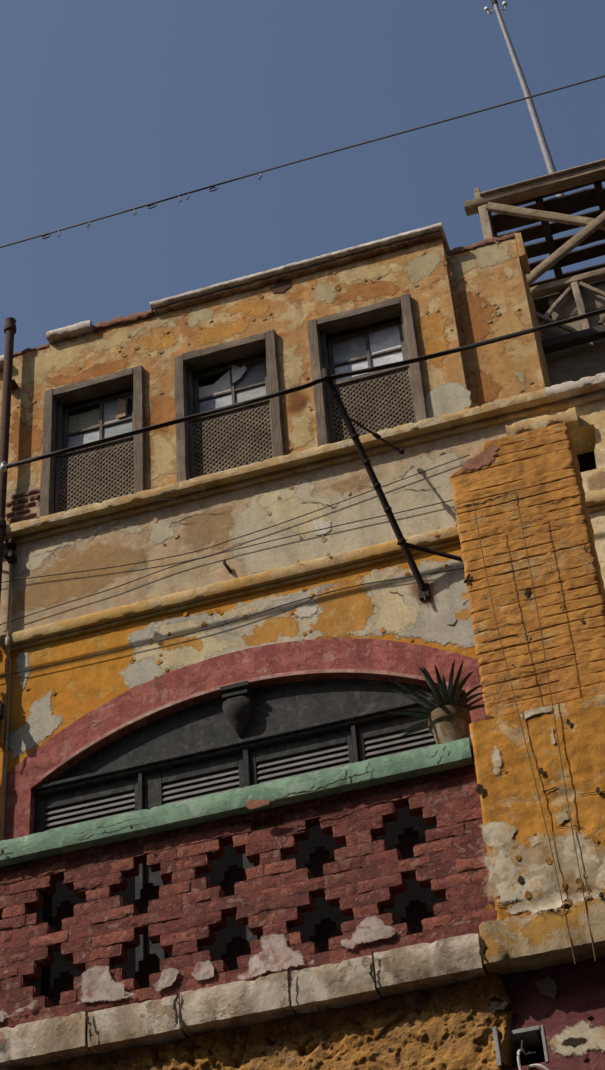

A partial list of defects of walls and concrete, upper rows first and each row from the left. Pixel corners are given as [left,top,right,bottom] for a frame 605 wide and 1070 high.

peeling [311,241,525,368]
peeling [0,279,292,525]
flaking render [231,442,498,580]
crack [453,492,578,536]
peeling [8,517,178,611]
flaking render [118,555,476,689]
crack [449,600,524,644]
flaking render [8,690,63,758]
peeling [479,808,605,914]
crack [172,988,180,1027]
crack [368,950,376,983]
peeling [547,1012,605,1060]